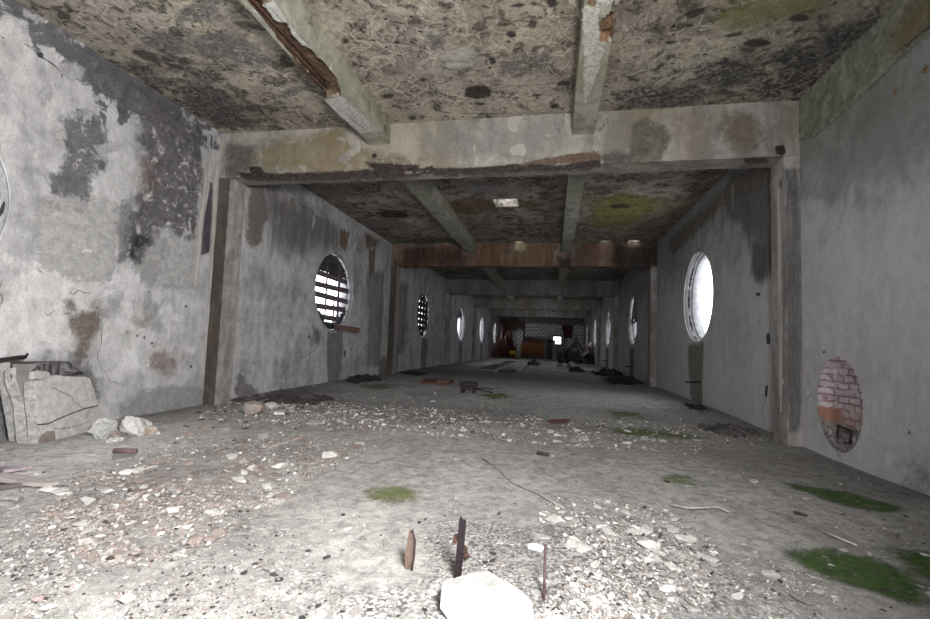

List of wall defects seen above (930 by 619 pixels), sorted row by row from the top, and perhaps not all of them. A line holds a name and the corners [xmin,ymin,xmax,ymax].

spalling [139,0,378,134]
peeling [581,0,616,108]
peeling [610,0,930,140]
leakage [50,116,109,203]
leakage [115,91,253,289]
leakage [612,244,658,268]
leakage [670,168,802,431]
spalling [817,351,863,457]